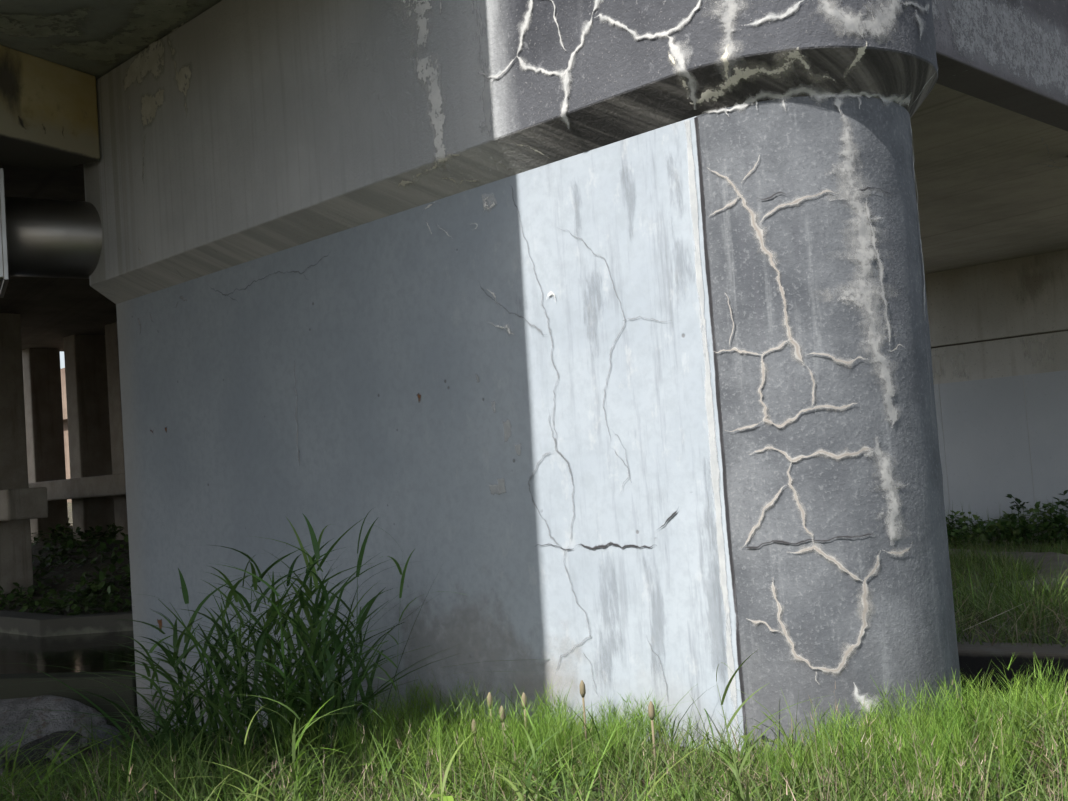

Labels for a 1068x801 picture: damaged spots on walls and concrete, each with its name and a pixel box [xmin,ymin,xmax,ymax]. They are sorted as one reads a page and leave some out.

peeling [398,0,476,187]
crack [479,0,701,129]
crack [748,1,802,25]
crack [708,123,925,685]
crack [536,511,677,550]